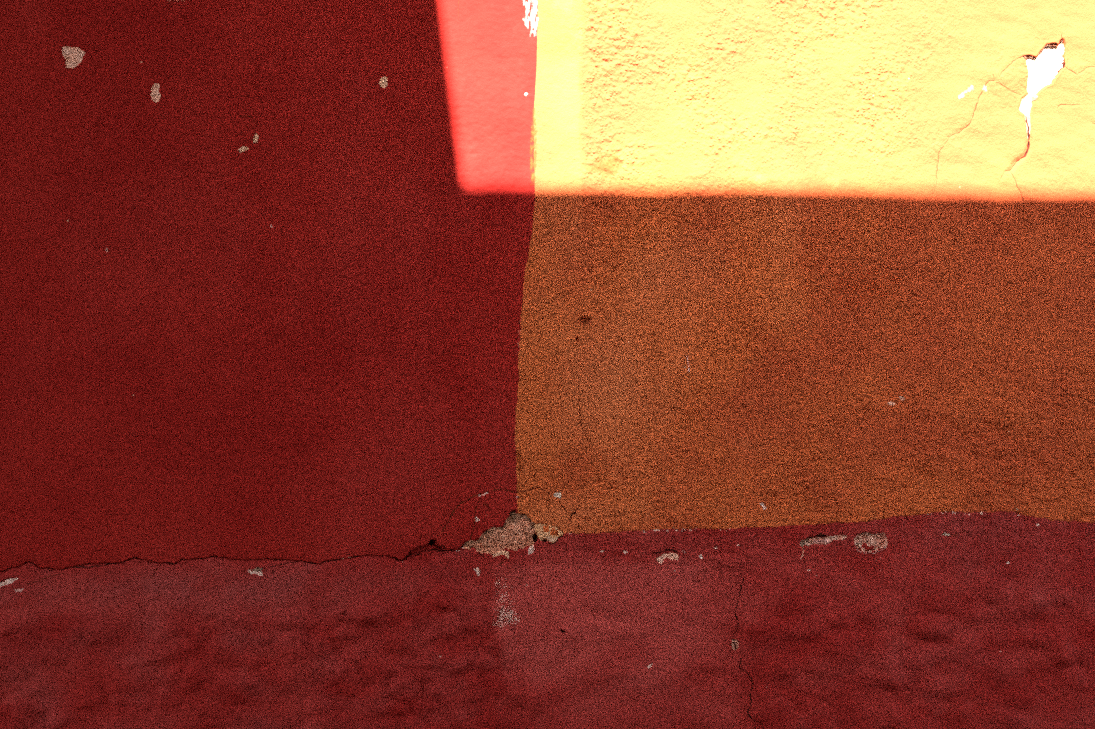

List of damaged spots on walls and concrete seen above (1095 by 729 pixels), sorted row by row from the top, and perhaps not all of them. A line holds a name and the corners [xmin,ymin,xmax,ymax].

spalling [62,46,85,69]
spalling [150,83,161,103]
crack [935,75,1021,188]
spalling [1000,35,1091,225]
crack [0,468,580,584]
spalling [454,496,564,558]
spalling [655,549,679,564]
spalling [800,532,888,558]
crack [731,575,764,729]